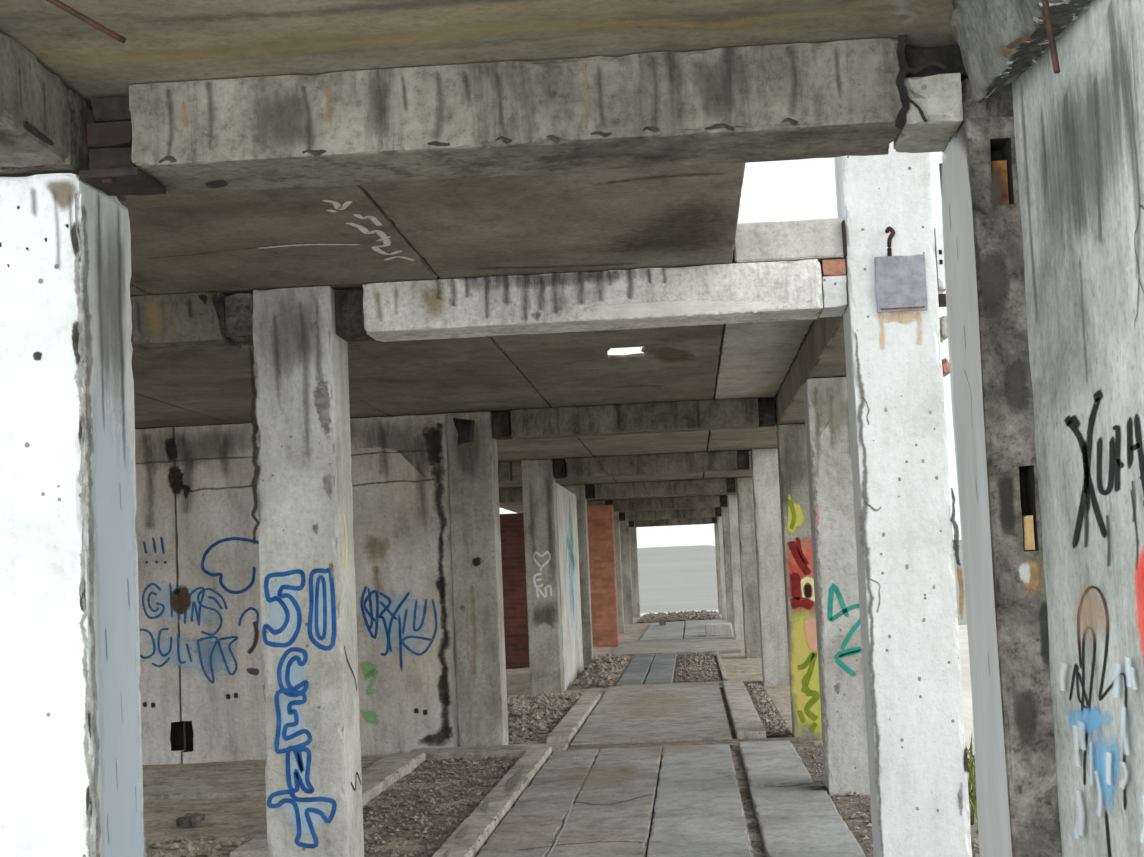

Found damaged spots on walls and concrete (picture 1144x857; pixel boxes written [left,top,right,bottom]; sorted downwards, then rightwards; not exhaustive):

crack [895,34,947,129]
leakage [985,0,1095,98]
leakage [1042,10,1136,239]
rust [879,313,921,349]